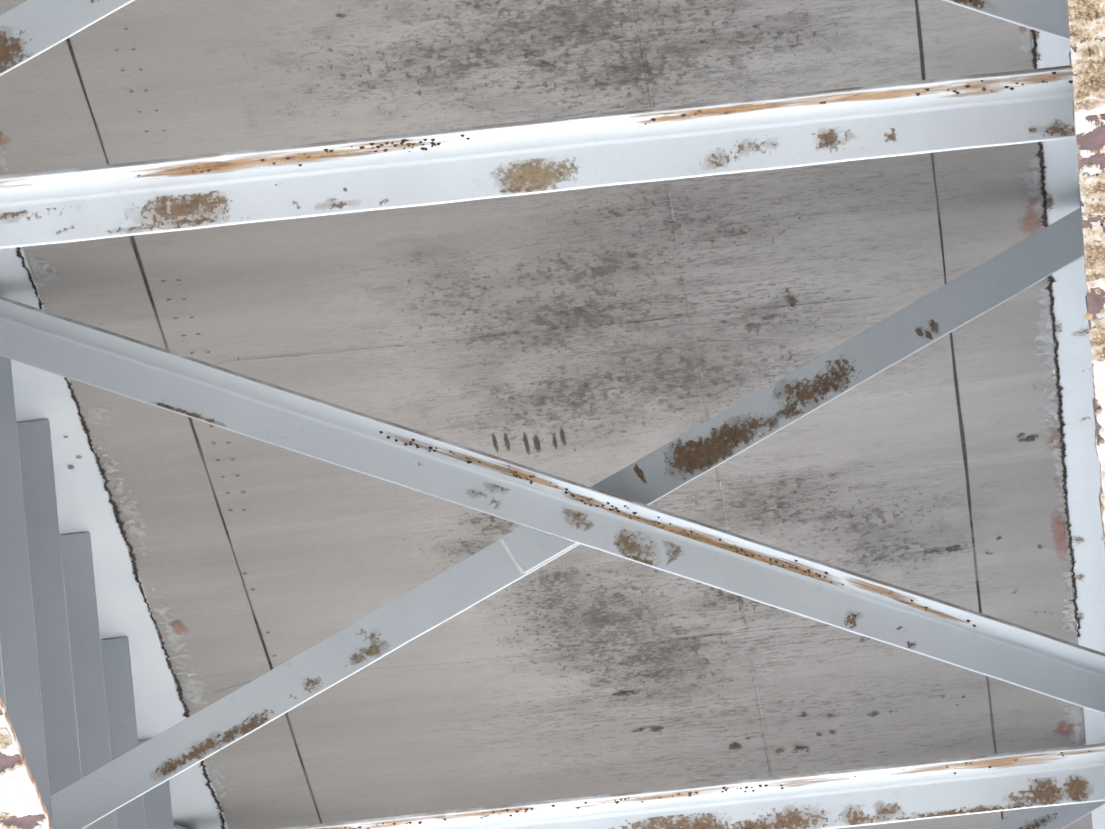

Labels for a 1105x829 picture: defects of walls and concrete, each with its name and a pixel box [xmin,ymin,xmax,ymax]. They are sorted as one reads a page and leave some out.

peeling [1067,0,1105,112]
corrosion [630,55,1073,125]
corrosion [137,139,441,176]
corrosion [1029,113,1105,175]
corrosion [108,191,232,233]
peeling [1078,172,1105,288]
peeling [1090,318,1105,364]
corrosion [664,356,854,480]
corrosion [379,431,976,627]
corrosion [155,711,268,775]
corrosion [576,780,834,809]
corrosion [621,776,1089,829]